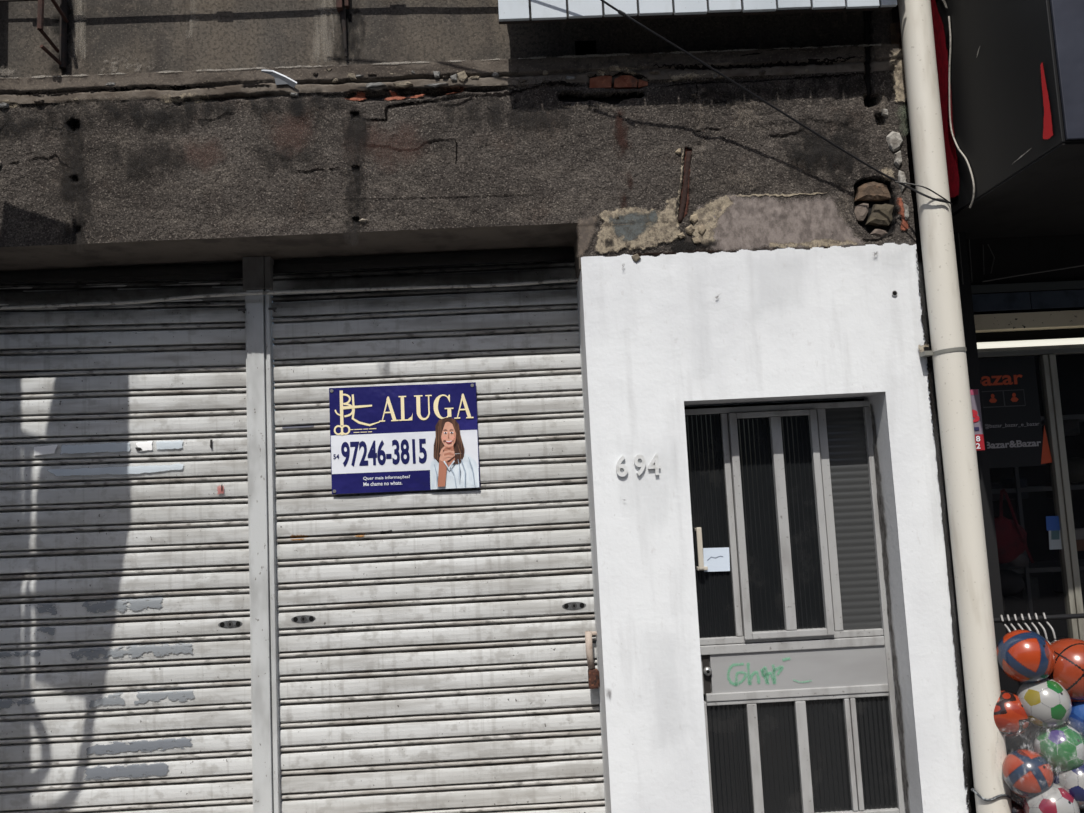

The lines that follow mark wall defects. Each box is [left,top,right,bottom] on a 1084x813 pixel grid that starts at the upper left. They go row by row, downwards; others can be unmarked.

crack [296,165,339,173]
flaking render [313,69,499,139]
crack [320,193,529,201]
crack [350,81,584,164]
flaking render [509,64,722,110]
peeling [578,11,910,262]